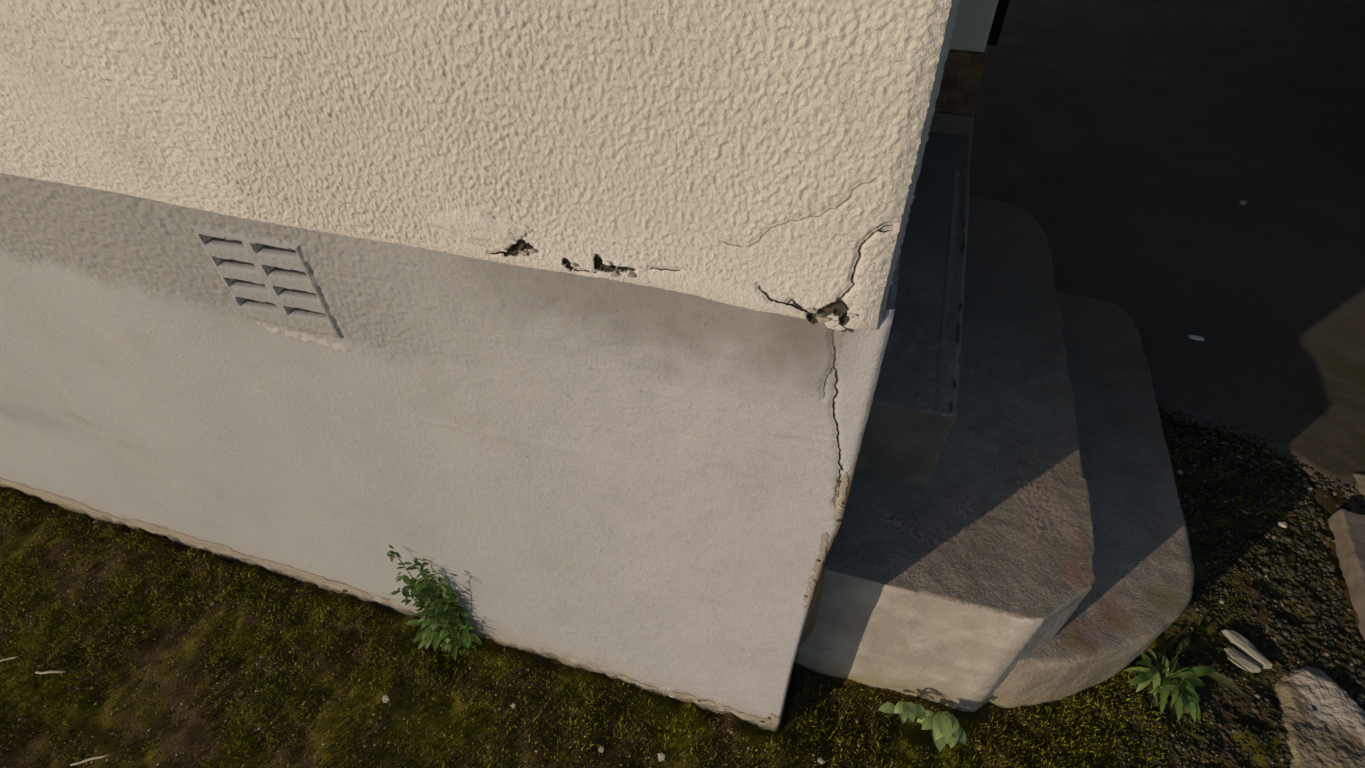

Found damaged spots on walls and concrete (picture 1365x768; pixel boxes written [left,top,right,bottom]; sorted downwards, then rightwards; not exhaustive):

crack [721,178,875,247]
flaking render [490,239,537,258]
flaking render [559,256,680,278]
crack [840,225,889,298]
flaking render [806,301,857,335]
crack [758,285,843,506]